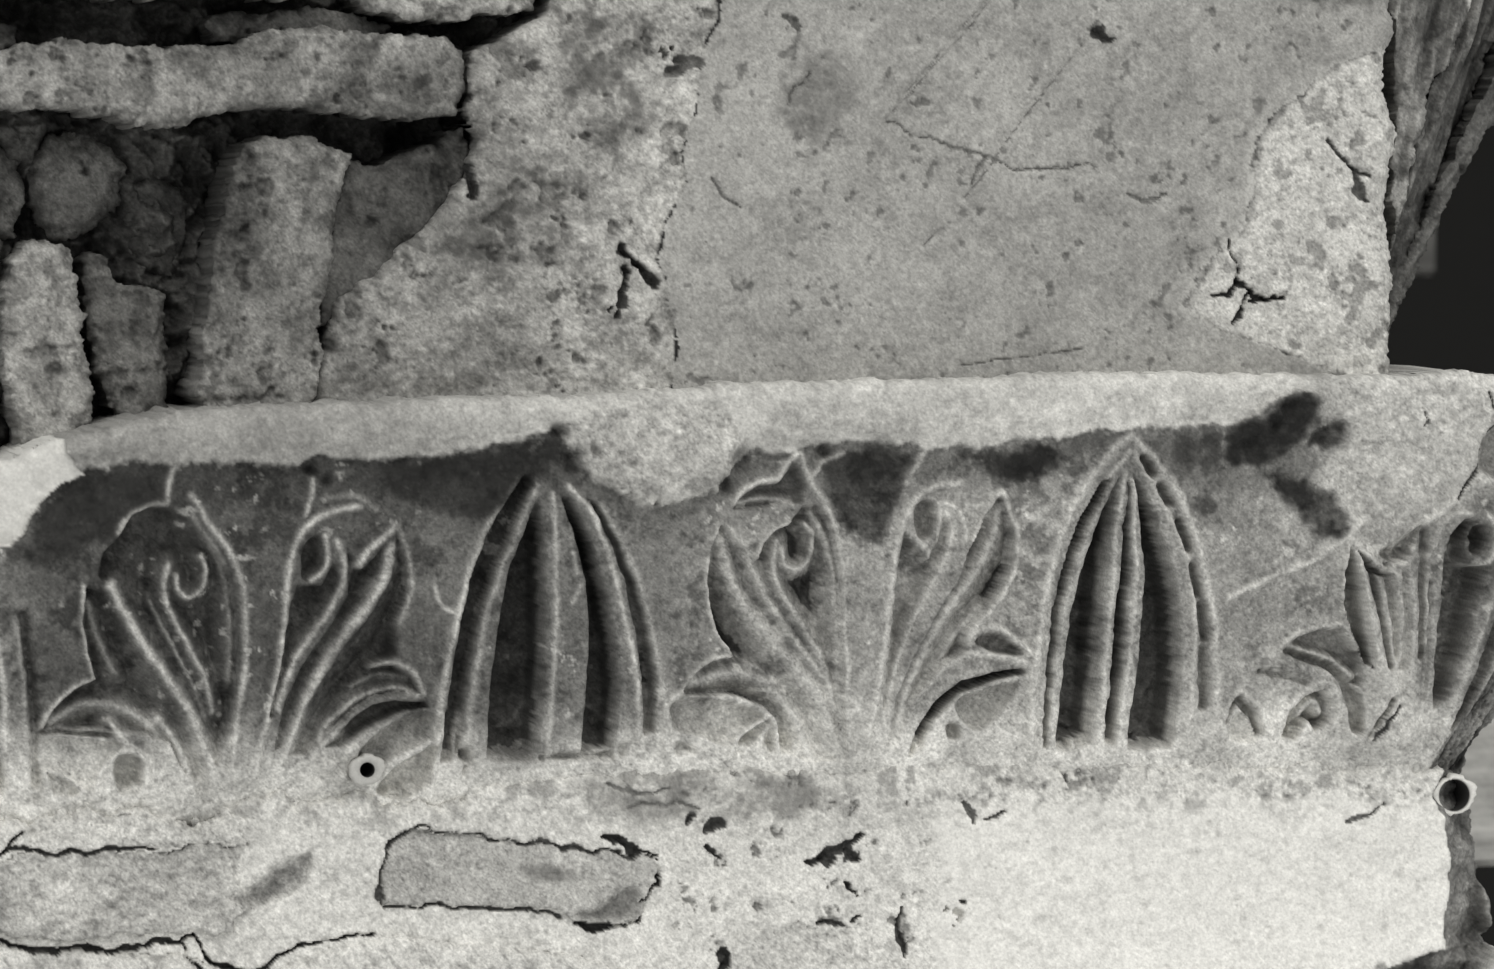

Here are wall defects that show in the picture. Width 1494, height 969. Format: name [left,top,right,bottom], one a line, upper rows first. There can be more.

crack [1326,139,1372,204]
peeling [312,0,746,507]
crack [1211,240,1287,326]
peeling [1183,50,1494,549]
spalling [0,434,85,548]